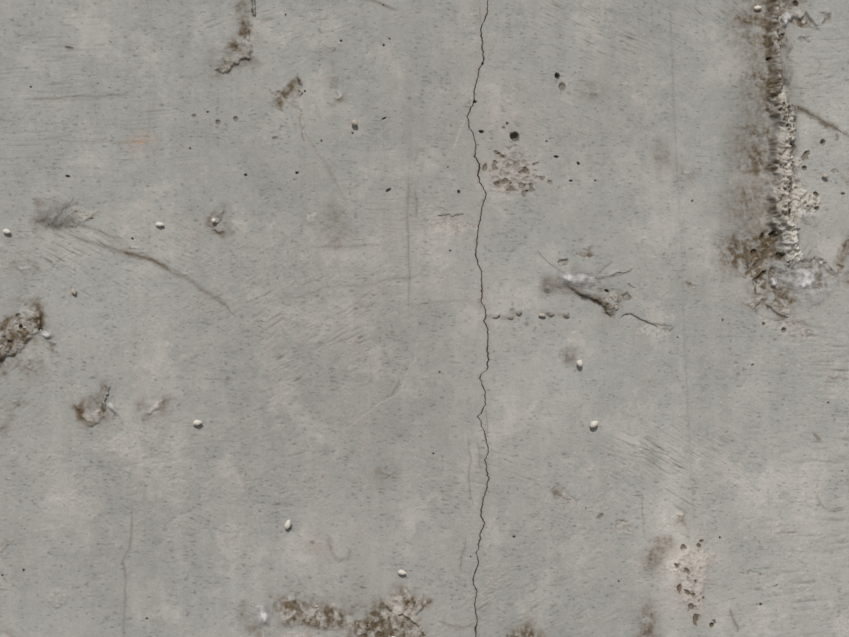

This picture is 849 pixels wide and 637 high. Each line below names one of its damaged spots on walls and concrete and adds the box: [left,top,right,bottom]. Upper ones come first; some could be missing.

spalling [777,0,834,51]
spalling [269,73,307,142]
spalling [774,102,823,225]
spalling [740,226,840,307]
crack [293,1,490,637]